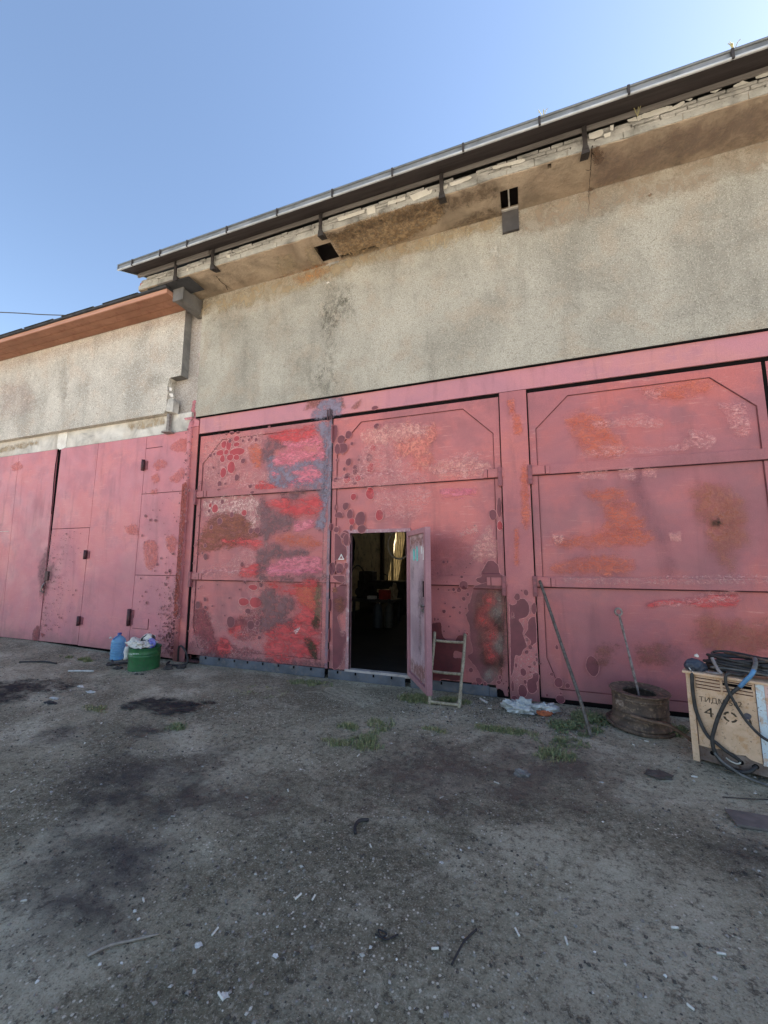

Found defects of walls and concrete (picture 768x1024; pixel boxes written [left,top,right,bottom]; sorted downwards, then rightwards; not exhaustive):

peeling [493,159,525,169]
peeling [588,125,614,166]
damp [522,109,768,231]
peeling [627,98,692,122]
spalling [330,176,472,256]
peeling [193,423,490,671]
peeling [431,497,570,704]